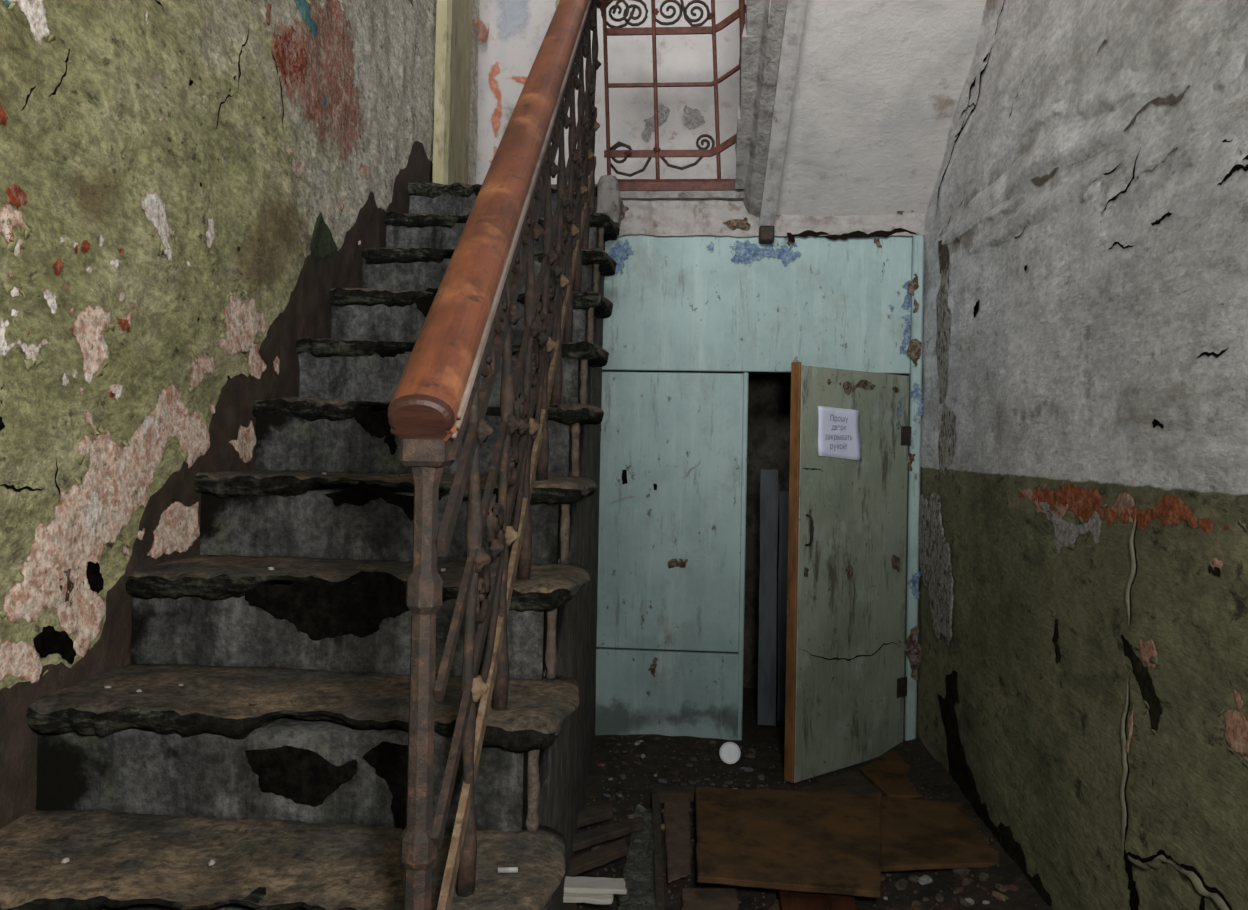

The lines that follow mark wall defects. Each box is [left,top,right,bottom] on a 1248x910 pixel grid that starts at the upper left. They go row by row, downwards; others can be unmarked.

peeling [3,0,56,46]
peeling [266,0,370,179]
crack [1031,167,1059,187]
crack [1093,85,1190,211]
crack [1218,139,1248,185]
peeling [723,217,801,267]
crack [1108,212,1172,250]
peeling [0,291,280,691]
peeling [1018,481,1247,554]
flaking render [245,571,409,641]
crack [1125,514,1138,628]
crack [1120,679,1232,910]